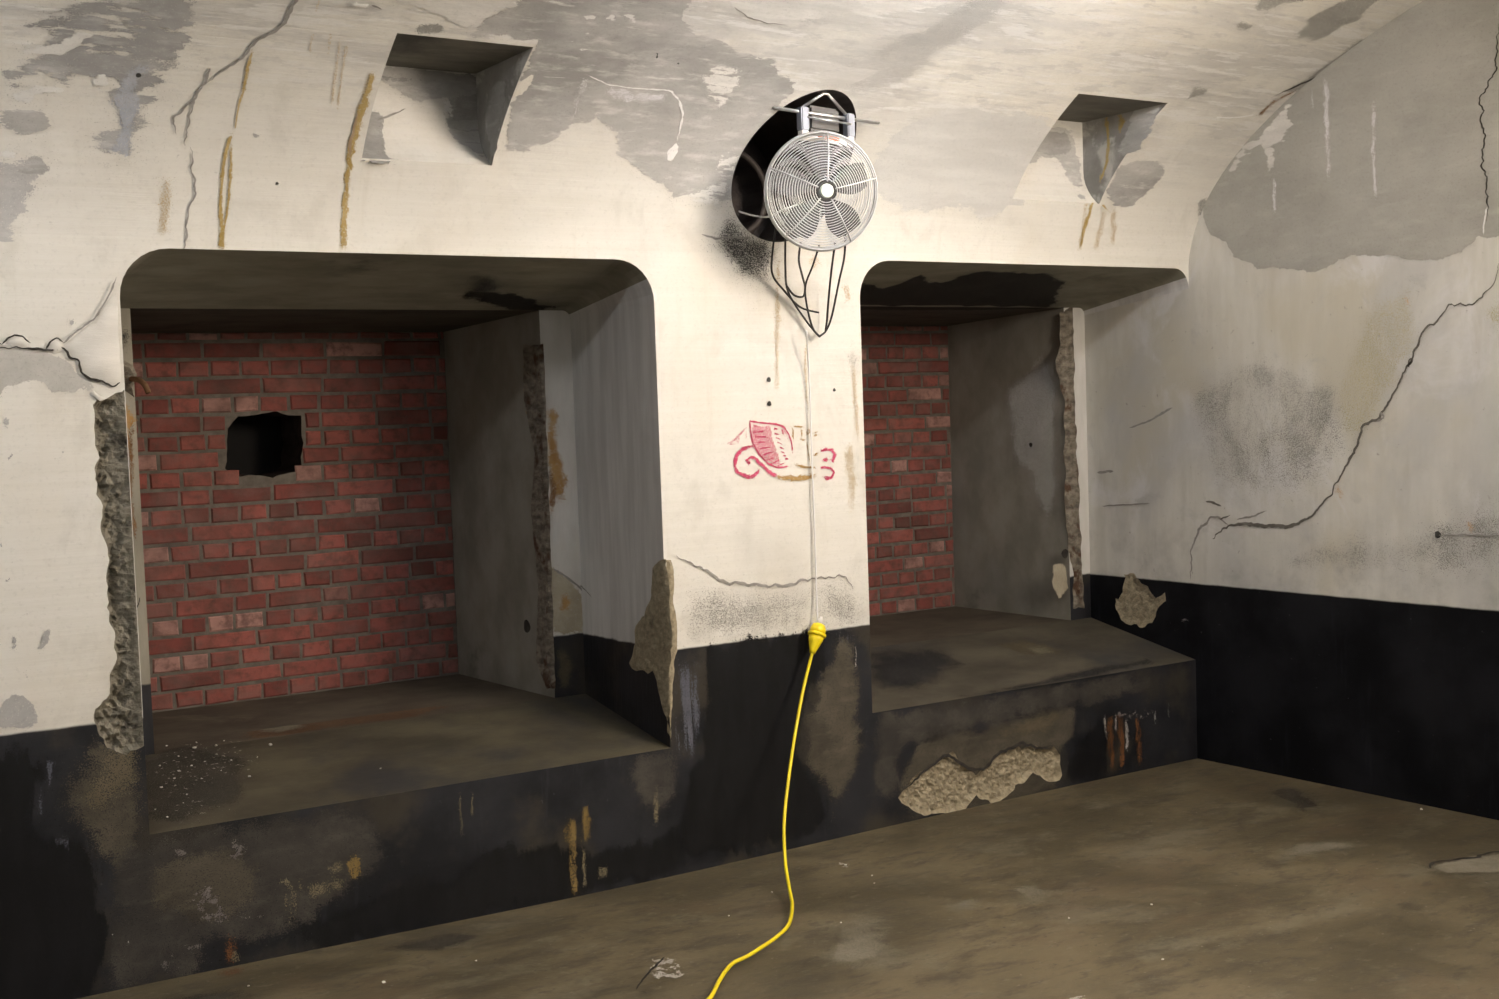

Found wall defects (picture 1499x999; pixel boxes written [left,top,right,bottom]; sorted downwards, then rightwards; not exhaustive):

rust [218,53,252,251]
crack [157,0,382,249]
rust [309,34,375,248]
peeling [362,0,965,201]
crack [0,346,120,387]
crack [1190,27,1499,580]
spalling [89,326,144,755]
crack [676,555,853,588]
water stain [0,738,112,999]
rust [563,806,608,897]
spalling [625,559,701,813]
spalling [898,741,1062,816]